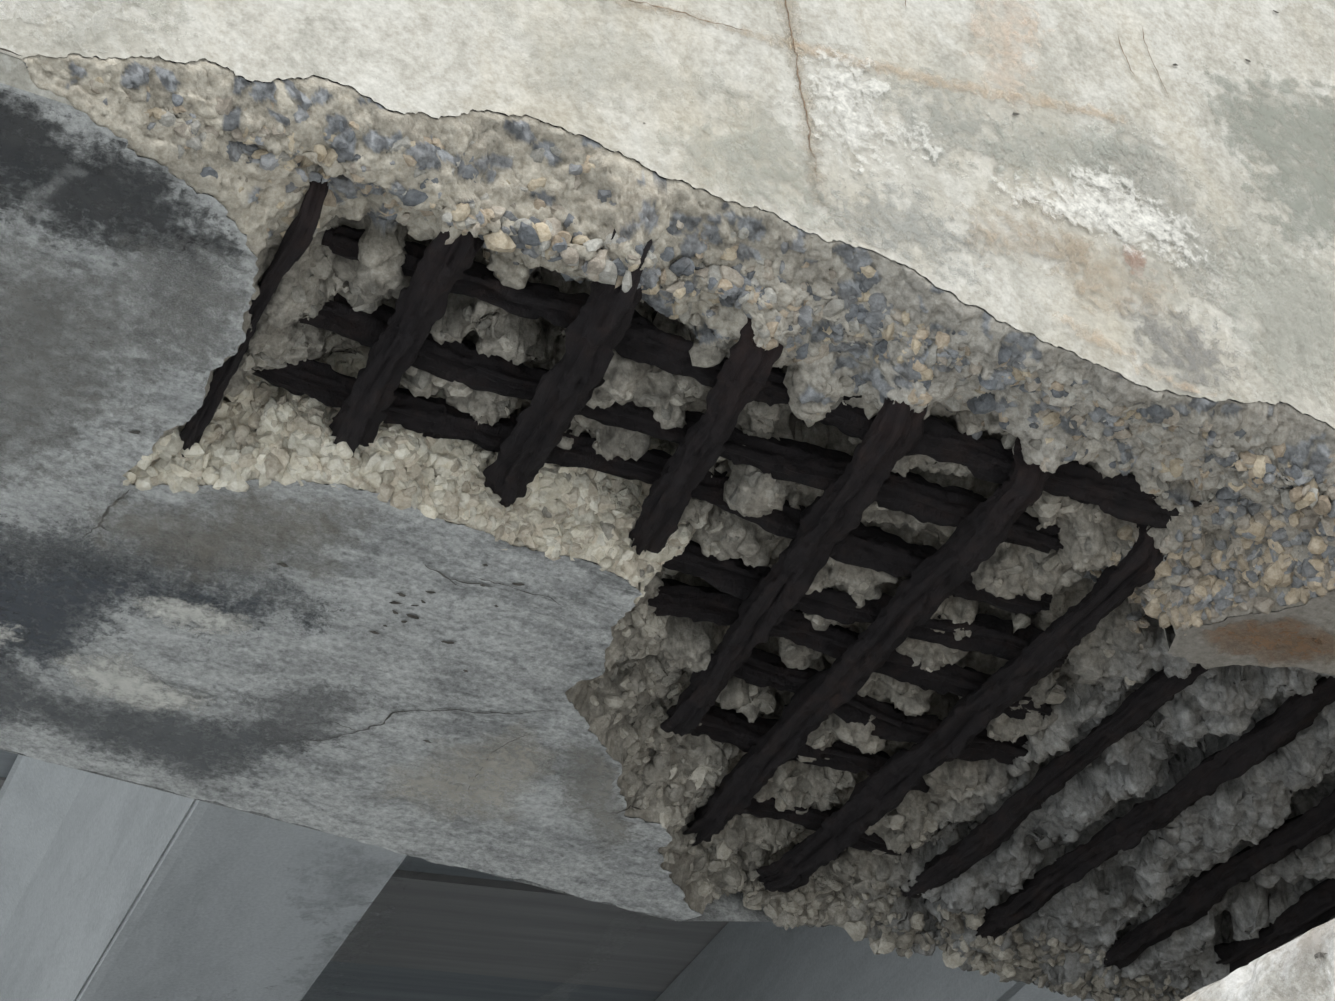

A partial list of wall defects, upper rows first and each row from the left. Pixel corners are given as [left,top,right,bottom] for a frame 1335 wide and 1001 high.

damp [0,89,243,275]
crack [629,0,752,32]
crack [785,0,818,184]
damp [868,76,1335,378]
spalling [557,349,712,461]
damp [0,520,363,781]
spalling [565,610,748,914]
corrosion [179,178,1208,899]
spalling [930,491,1139,641]
spalling [885,665,1335,1001]
corrosion [975,676,1335,941]
corrosion [1103,789,1335,973]